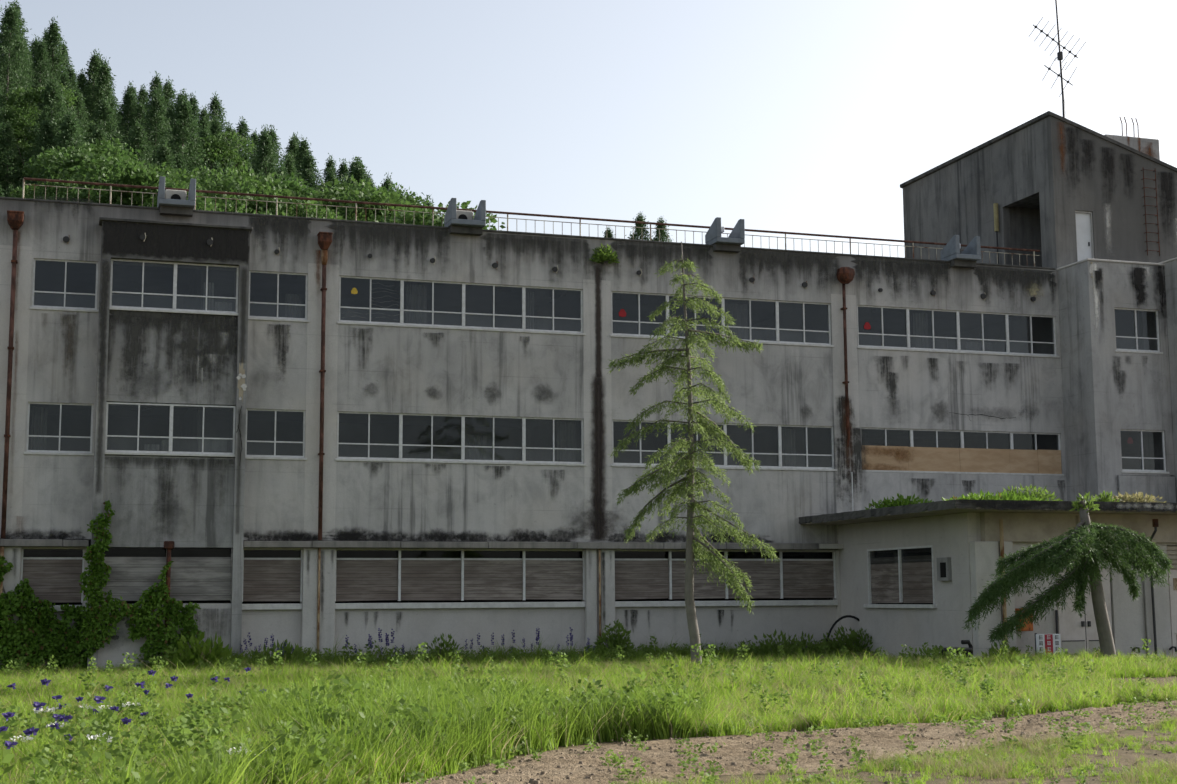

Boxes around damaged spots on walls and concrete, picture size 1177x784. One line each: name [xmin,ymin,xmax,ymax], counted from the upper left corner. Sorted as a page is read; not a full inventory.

leakage [1067,128,1133,195]
leakage [1161,172,1175,225]
leakage [611,240,712,265]
leakage [97,215,311,513]
leakage [244,233,686,619]